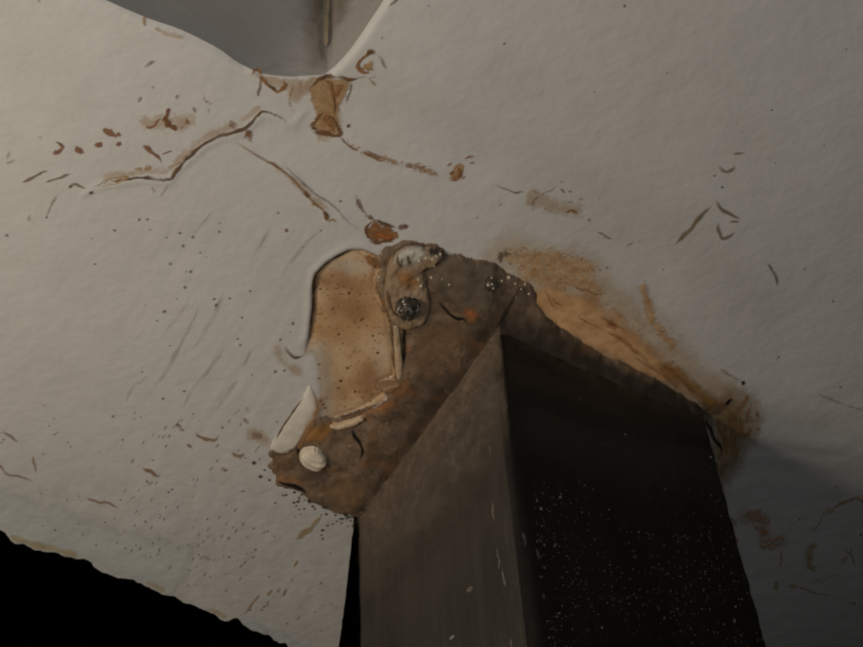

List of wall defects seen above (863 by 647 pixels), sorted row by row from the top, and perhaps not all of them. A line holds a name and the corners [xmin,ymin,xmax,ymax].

crack [23,111,338,222]
corrosion [252,50,437,176]
corrosion [447,156,473,181]
corrosion [677,208,709,242]
peeling [268,240,704,518]